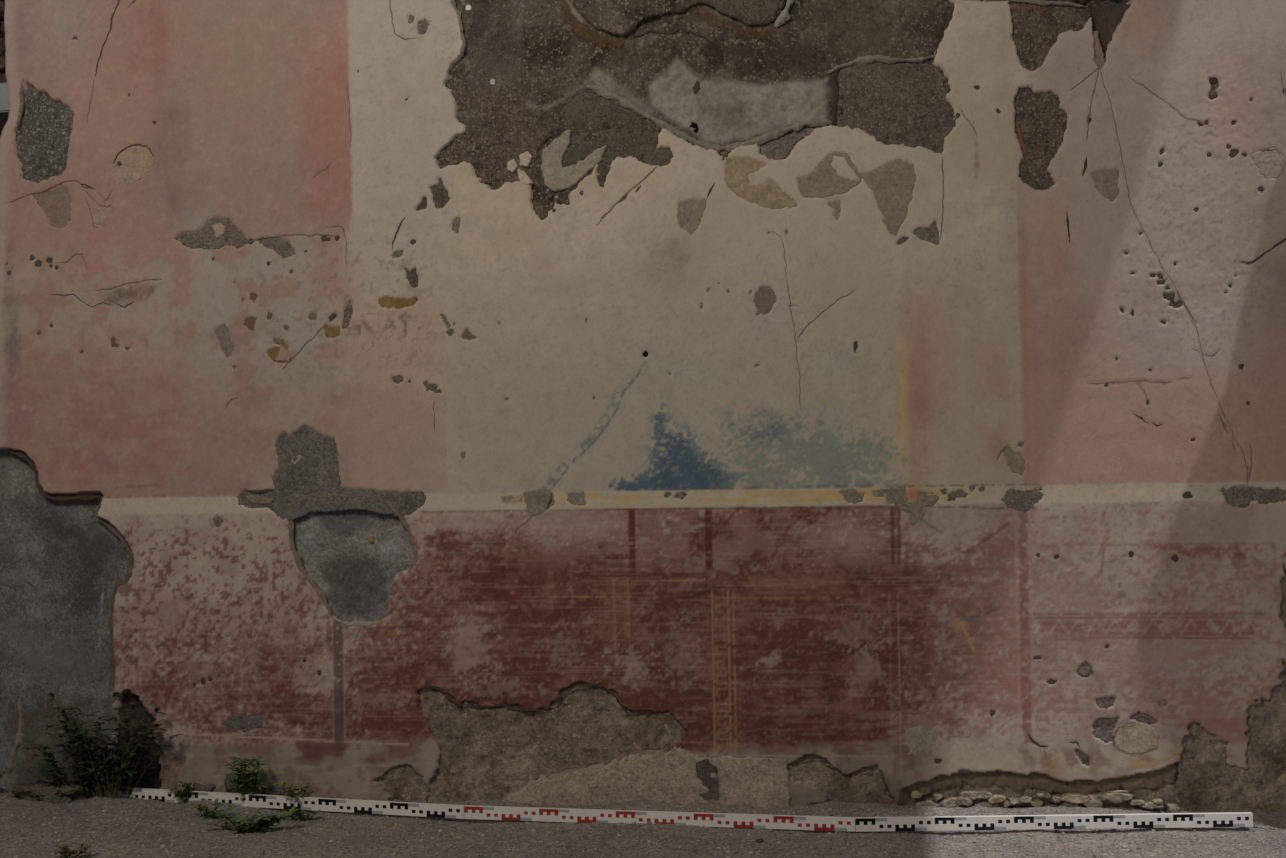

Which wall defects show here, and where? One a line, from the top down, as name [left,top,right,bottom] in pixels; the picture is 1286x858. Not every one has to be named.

spalling [971,0,1131,71]
spalling [10,79,95,228]
peeling [416,0,960,245]
spalling [996,87,1067,190]
peeling [1090,168,1120,201]
peeling [175,217,340,273]
crack [1069,66,1252,485]
crack [1240,238,1286,264]
spalling [118,691,163,789]
spalling [375,682,686,803]
spalling [1093,699,1168,742]
spalling [1176,660,1286,812]